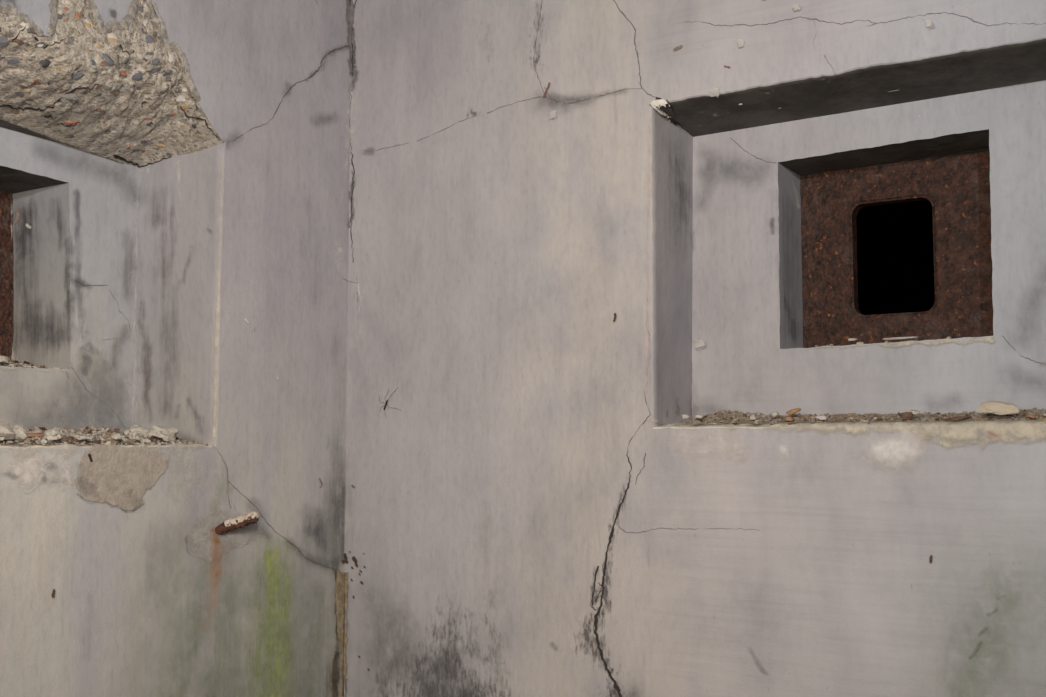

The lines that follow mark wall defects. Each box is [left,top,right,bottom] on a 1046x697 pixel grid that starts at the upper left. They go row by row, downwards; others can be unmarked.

spalling [0,0,224,167]
crack [694,12,1044,81]
crack [228,0,675,308]
flaking render [9,444,169,512]
crack [214,447,334,569]
crack [576,399,755,697]
leakage [390,631,496,697]